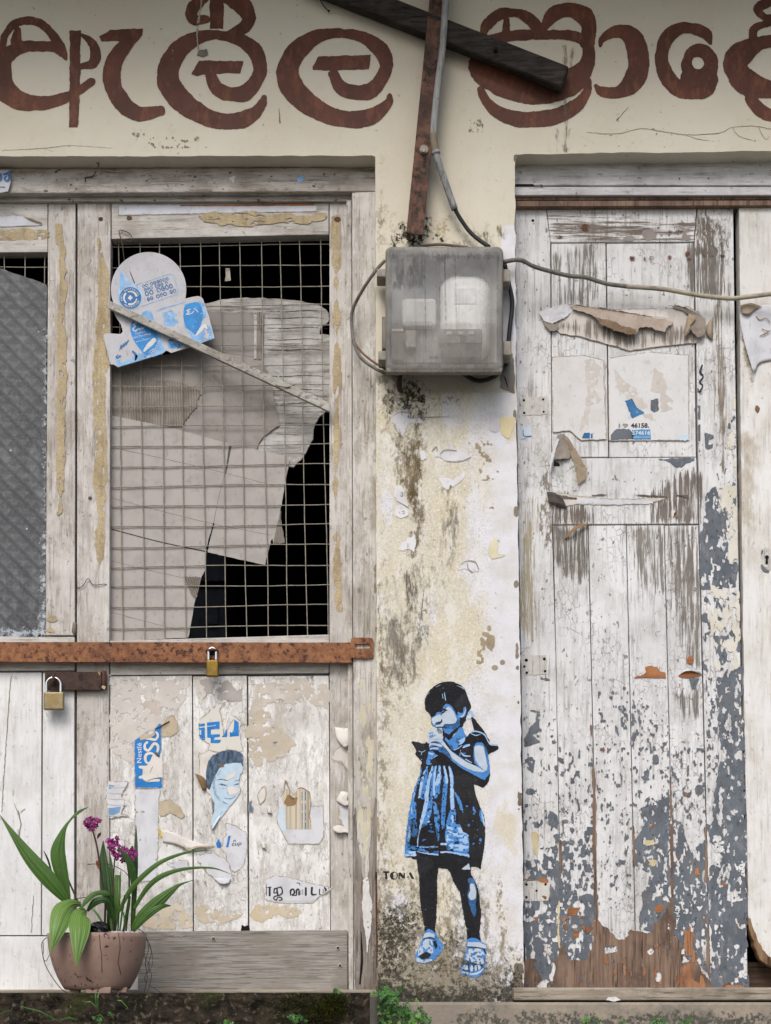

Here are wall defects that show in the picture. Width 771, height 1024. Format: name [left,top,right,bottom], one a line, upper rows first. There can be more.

peeling [0,223,68,515]
peeling [92,238,110,567]
peeling [199,210,343,509]
peeling [392,411,441,436]
damp [383,380,459,557]
peeling [420,440,499,490]
peeling [500,410,516,439]
peeling [332,533,343,612]
damp [379,574,429,678]
peeling [513,215,749,1002]
damp [494,883,507,976]